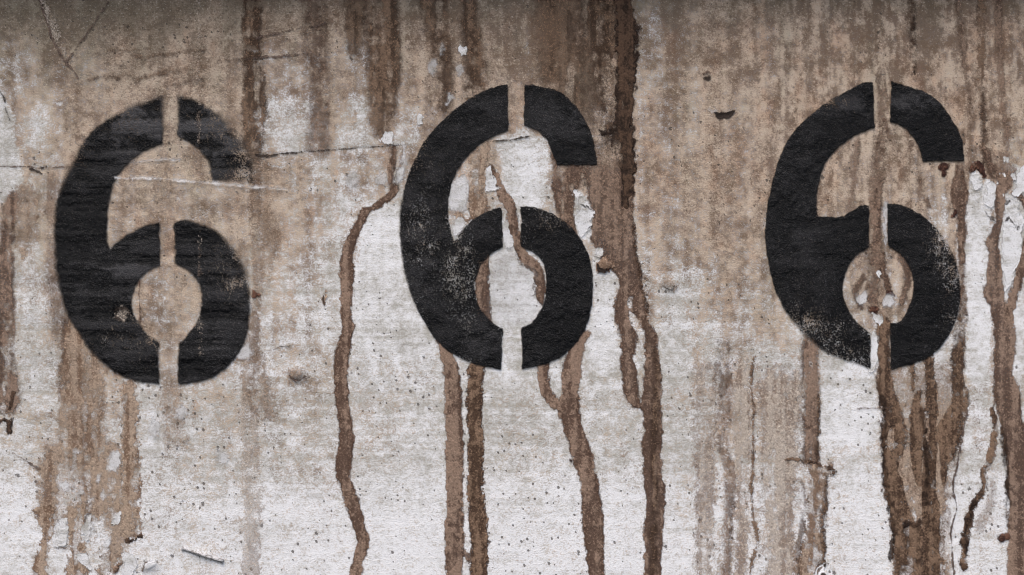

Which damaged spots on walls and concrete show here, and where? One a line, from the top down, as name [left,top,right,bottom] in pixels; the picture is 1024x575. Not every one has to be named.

crack [0,166,70,174]
damp [32,245,143,575]
damp [299,0,329,153]
crack [255,145,398,158]
corrosion [333,146,404,575]
damp [344,0,402,137]
damp [420,0,488,112]
corrosion [436,336,490,575]
peeling [573,189,595,237]
corrosion [583,0,667,575]
corrosion [852,147,1024,575]
peeling [969,156,1024,291]